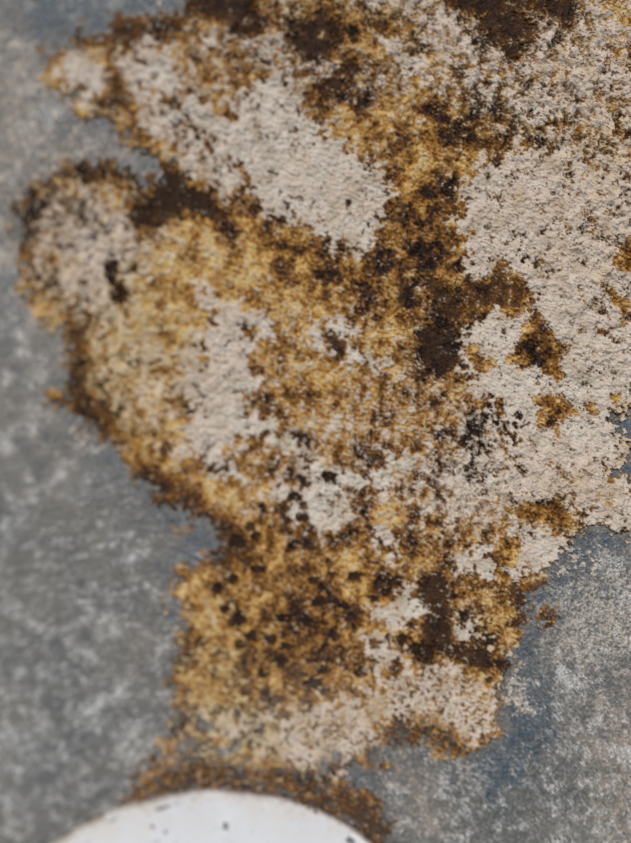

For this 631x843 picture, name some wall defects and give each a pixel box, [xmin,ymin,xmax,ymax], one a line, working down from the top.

corrosion [104,256,121,287]
corrosion [612,236,631,274]
corrosion [600,281,631,318]
corrosion [464,343,498,375]
corrosion [582,399,602,416]
corrosion [607,391,624,406]
water stain [618,459,631,478]
water stain [63,439,219,644]
corrosion [531,600,562,636]
corrosion [377,708,472,763]
corrosion [119,754,256,807]
corrosion [249,753,401,843]